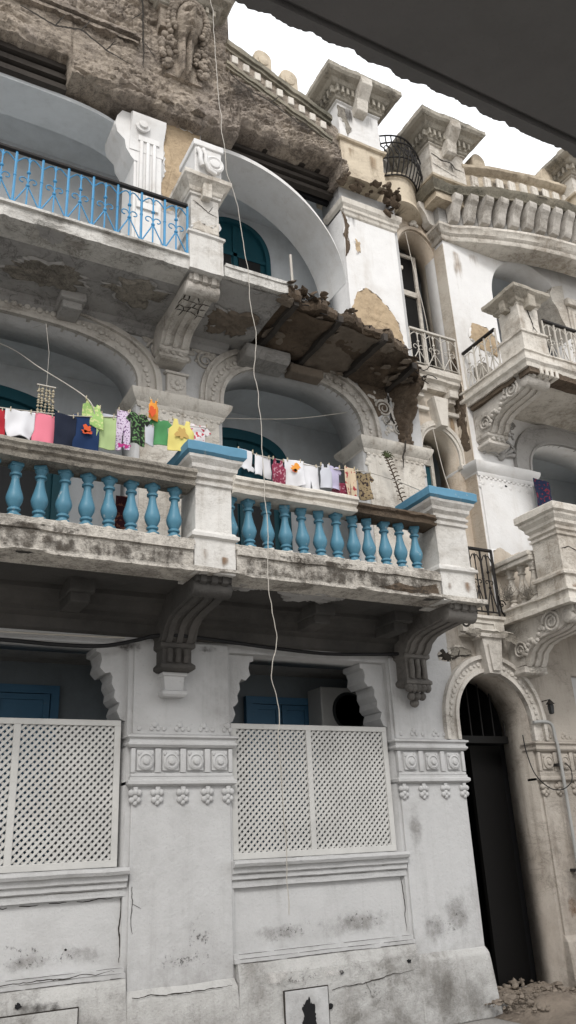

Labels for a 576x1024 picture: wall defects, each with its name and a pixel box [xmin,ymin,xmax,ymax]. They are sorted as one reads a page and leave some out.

flaking render [337,105,352,135]
flaking render [161,124,200,214]
flaking render [203,306,260,338]
flaking render [352,288,414,351]
flaking render [356,382,389,417]
flaking render [450,323,500,452]
leakage [0,521,183,565]
crack [0,864,412,999]